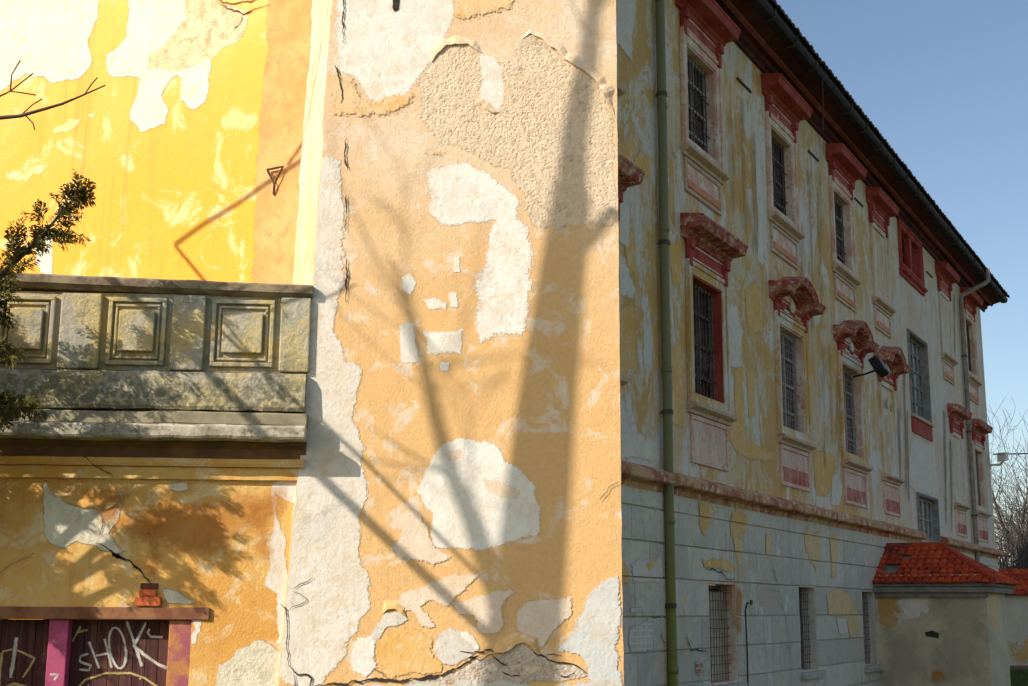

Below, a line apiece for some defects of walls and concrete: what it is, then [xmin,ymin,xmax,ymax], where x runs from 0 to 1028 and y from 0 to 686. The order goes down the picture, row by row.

flaking render [0,0,99,93]
flaking render [105,0,248,132]
crack [218,0,269,29]
flaking render [251,0,312,284]
spalling [326,0,636,387]
peeling [35,223,53,274]
crack [343,258,351,303]
peeling [216,156,622,686]
peeling [43,478,123,554]
crack [95,513,195,605]
peeling [191,620,201,644]
crack [281,578,588,686]